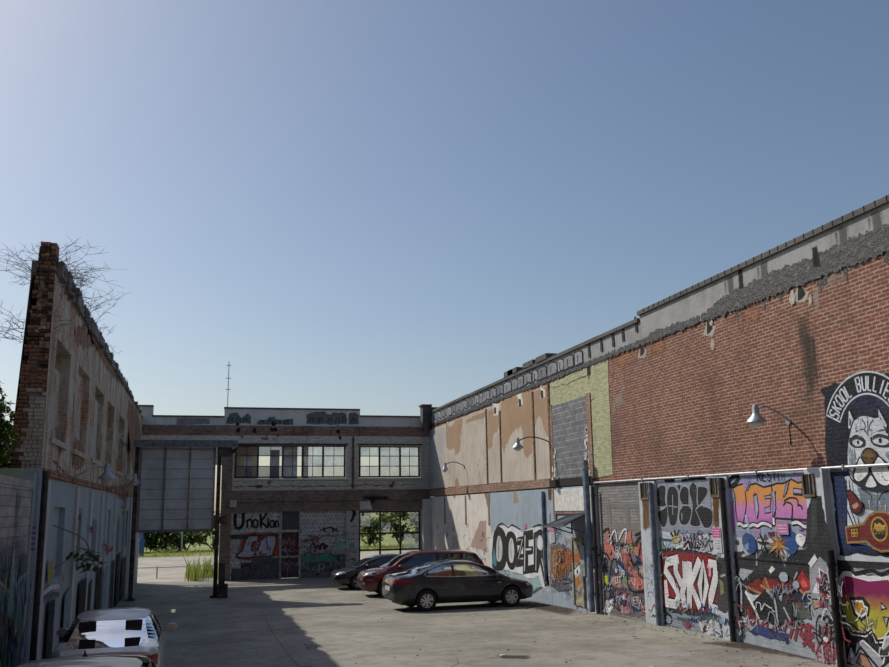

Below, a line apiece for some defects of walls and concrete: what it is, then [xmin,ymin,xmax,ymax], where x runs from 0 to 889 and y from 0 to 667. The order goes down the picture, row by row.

damp [812,247,820,267]
spalling [789,285,812,305]
spalling [703,319,716,350]
spalling [116,382,550,484]